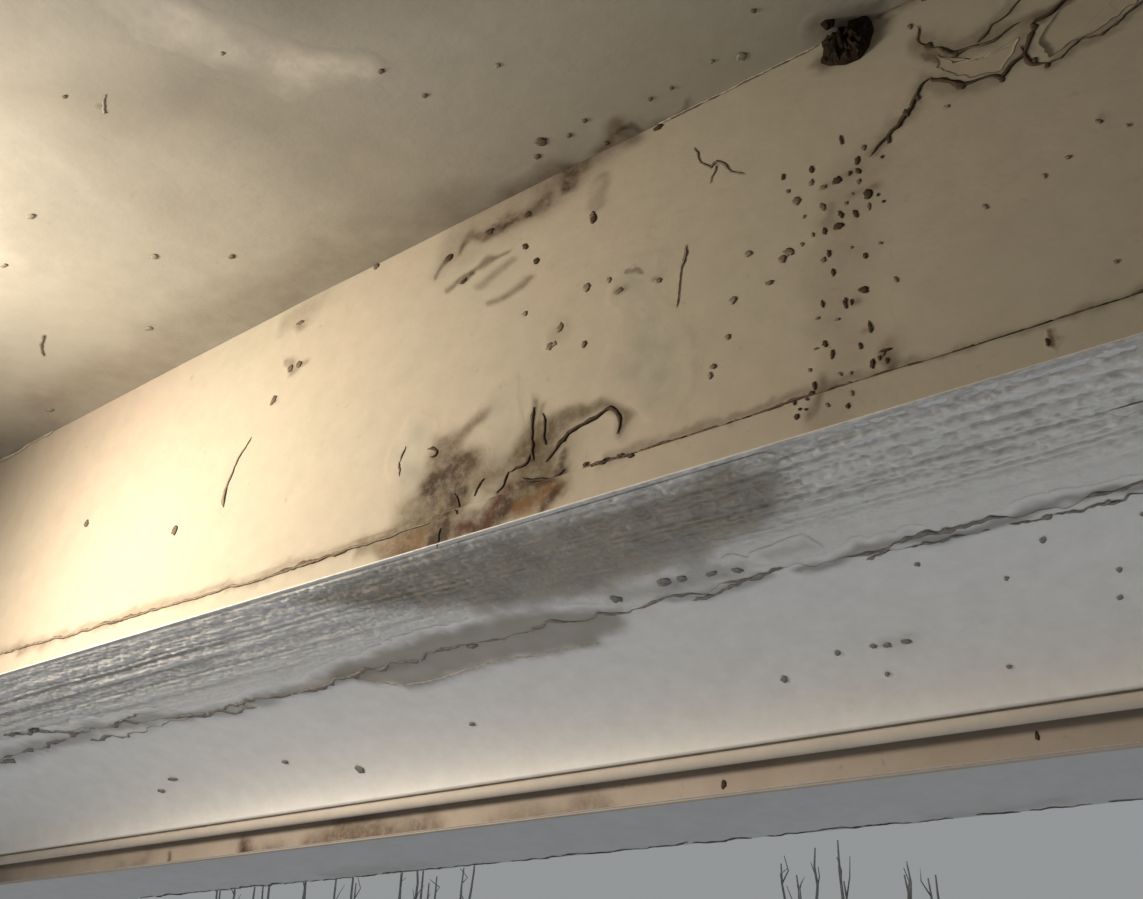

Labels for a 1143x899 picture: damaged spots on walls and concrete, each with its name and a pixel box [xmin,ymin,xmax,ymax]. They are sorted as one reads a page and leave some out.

crack [869,0,1143,157]
water stain [765,117,918,439]
rust [348,370,638,569]
water stain [280,452,824,694]
water stain [866,626,927,658]